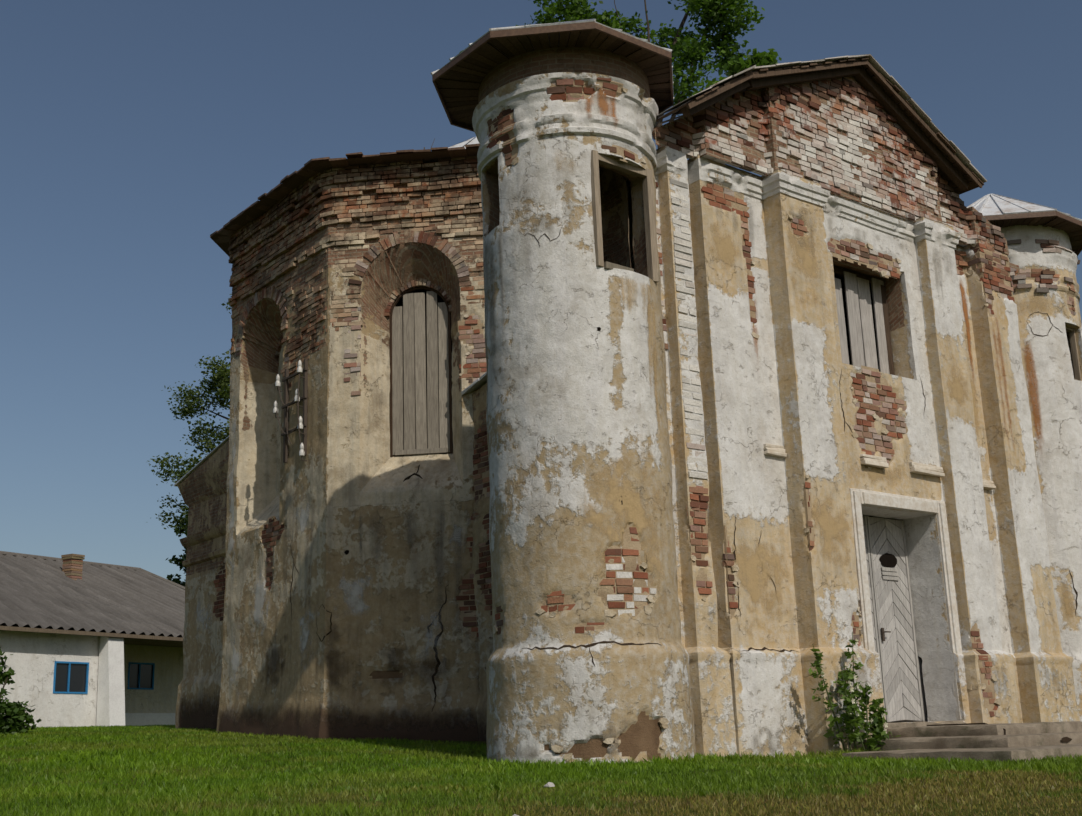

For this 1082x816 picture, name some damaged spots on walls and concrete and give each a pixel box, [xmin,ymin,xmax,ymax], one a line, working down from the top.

spalling [547,77,628,102]
spalling [850,365,908,481]
spalling [472,426,490,501]
spalling [213,558,226,623]
spalling [258,516,287,590]
spalling [456,511,504,637]
spalling [575,458,661,633]
spalling [686,486,713,602]
crack [427,585,448,711]
crack [527,641,660,666]
leakage [179,698,487,741]
spalling [544,711,669,762]